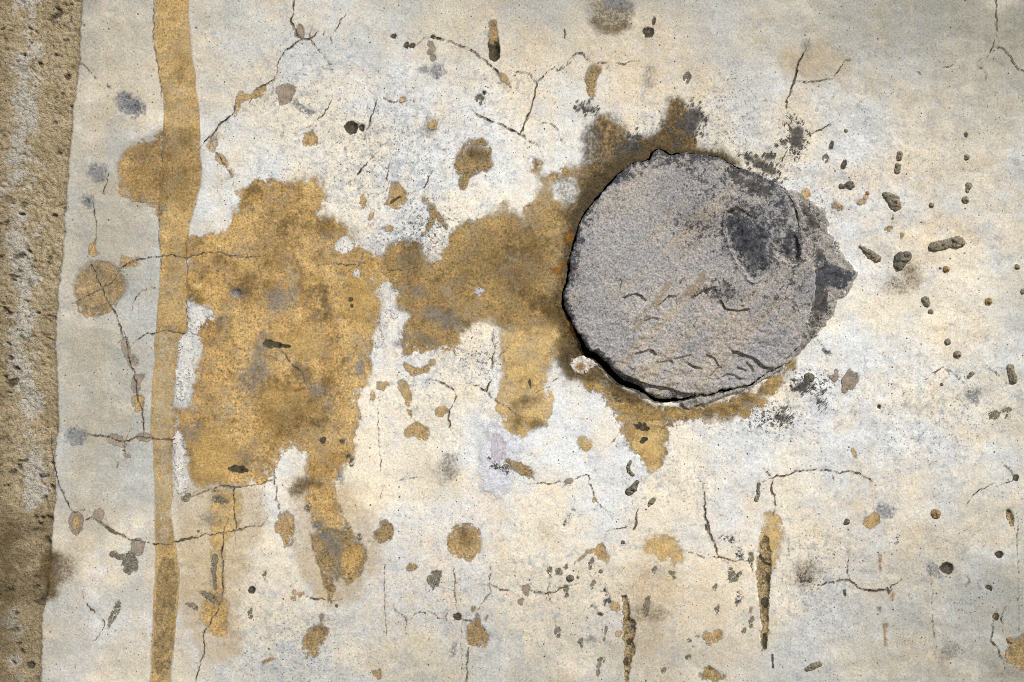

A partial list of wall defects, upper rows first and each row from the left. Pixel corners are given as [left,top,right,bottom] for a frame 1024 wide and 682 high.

crack [153,5,163,98]
crack [190,0,346,184]
crack [346,97,415,191]
crack [417,29,633,146]
crack [782,39,851,161]
crack [72,128,266,467]
crack [50,425,281,682]
spalling [756,511,783,668]
crack [686,477,902,594]
crack [759,468,876,515]